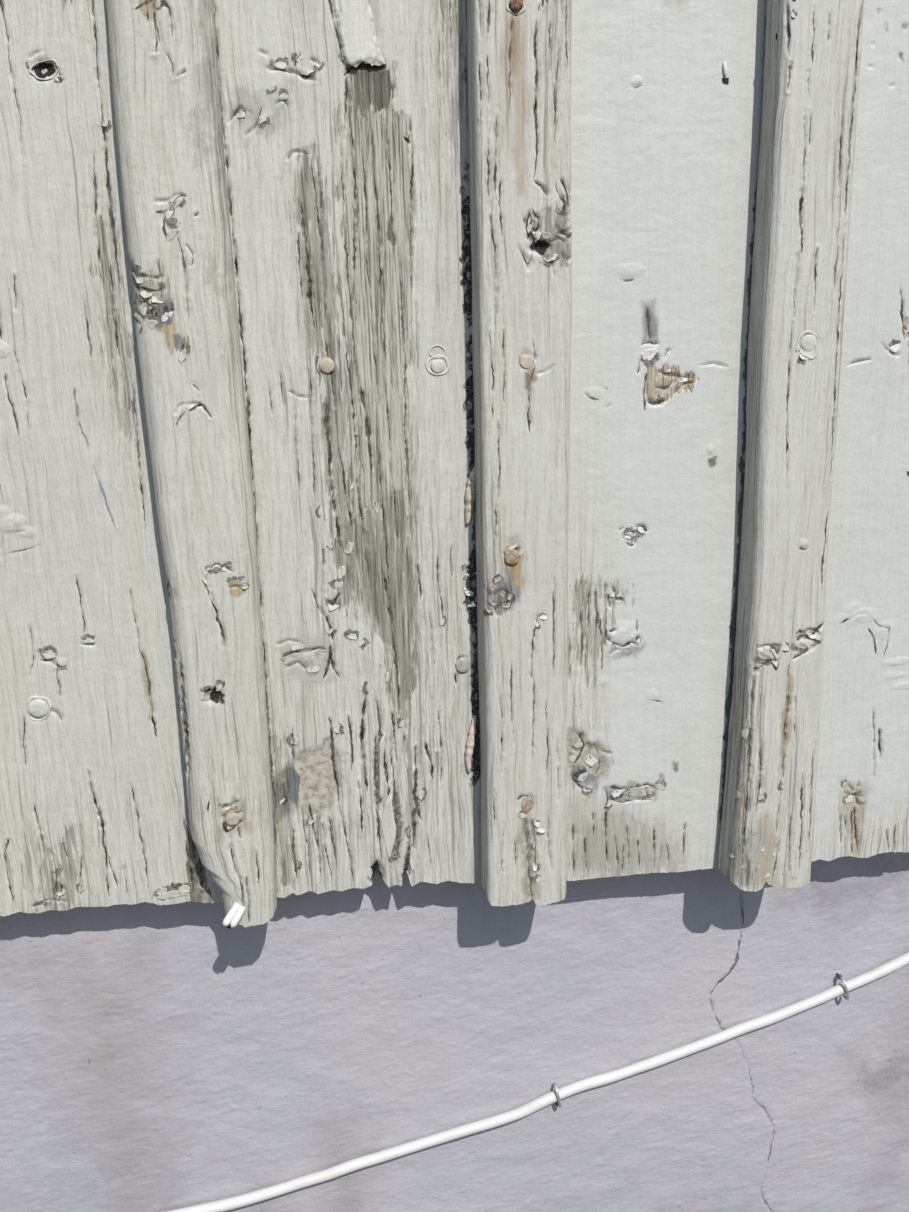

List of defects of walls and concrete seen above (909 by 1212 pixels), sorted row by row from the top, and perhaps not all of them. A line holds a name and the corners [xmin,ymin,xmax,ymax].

peeling [270,53,324,80]
peeling [86,169,190,442]
peeling [281,0,427,724]
peeling [638,308,705,408]
peeling [887,291,909,366]
corrosion [505,556,522,591]
peeling [568,573,635,688]
peeling [269,718,373,893]
peeling [373,730,403,862]
peeling [567,730,666,809]
peeling [728,624,823,891]
crack [711,910,744,1020]